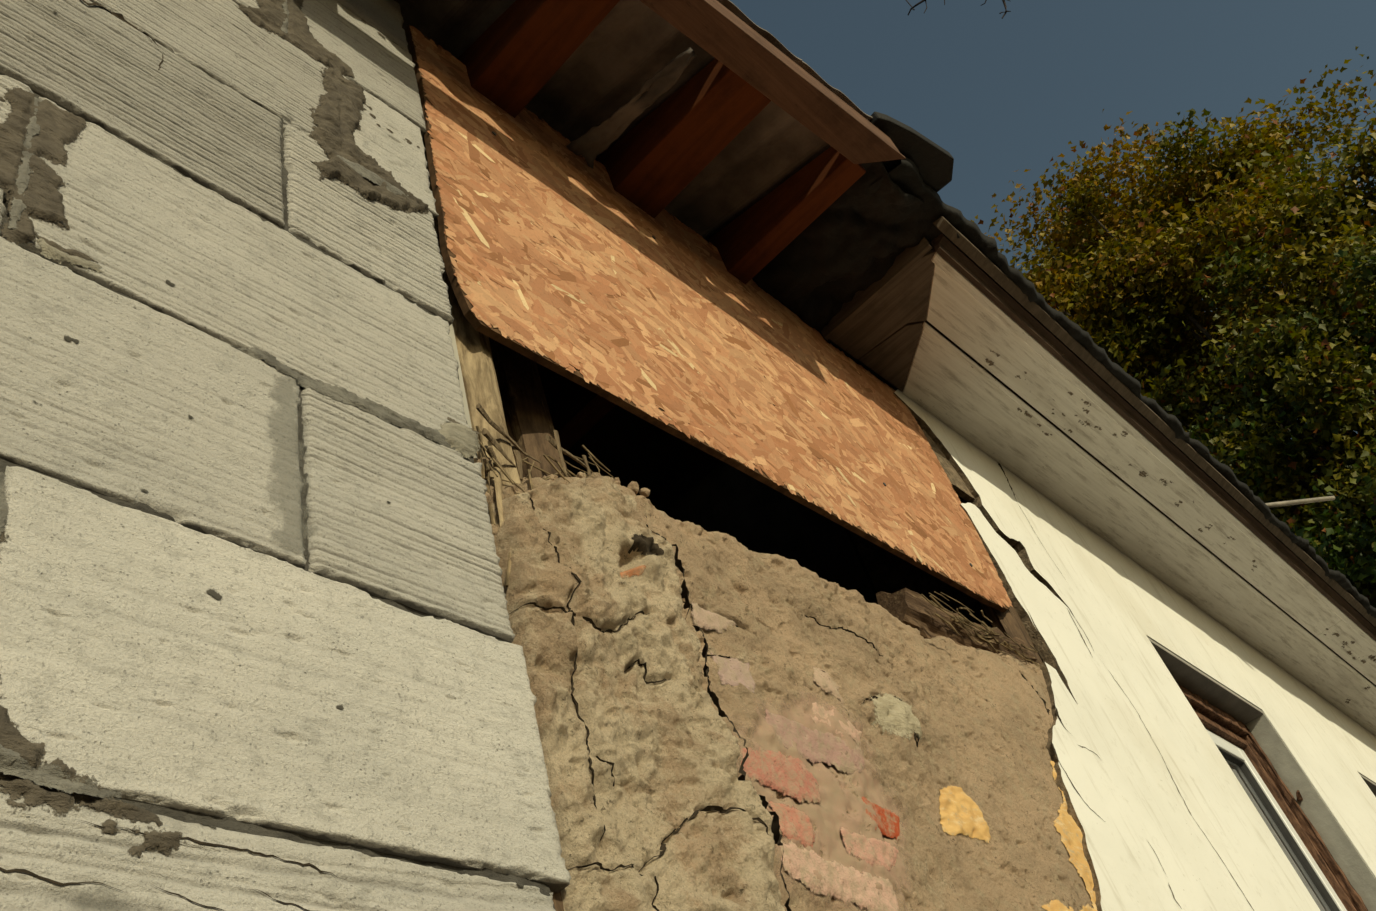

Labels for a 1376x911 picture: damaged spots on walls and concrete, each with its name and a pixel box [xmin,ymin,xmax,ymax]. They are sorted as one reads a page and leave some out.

flaking render [691,602,736,633]
crack [805,615,883,656]
crack [510,498,792,911]
crack [821,670,920,748]
crack [998,463,1254,910]
crack [0,867,310,911]
crack [179,837,353,883]
flaking render [711,653,910,911]
peeling [939,785,991,843]
peeling [1041,761,1097,911]